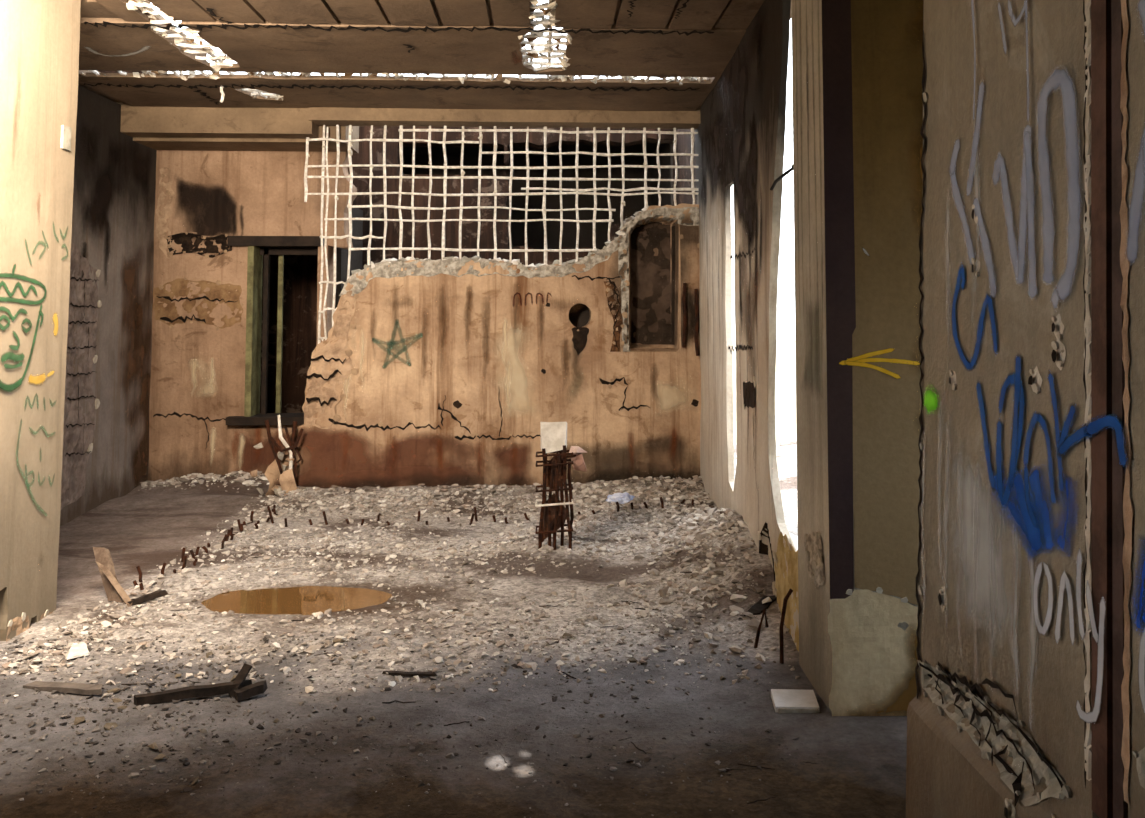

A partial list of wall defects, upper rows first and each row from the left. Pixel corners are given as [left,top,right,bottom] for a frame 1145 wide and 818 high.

damp [84,133,150,231]
damp [122,255,152,487]
damp [177,181,236,240]
spalling [304,125,700,429]
crack [915,0,1092,806]
crack [1120,0,1133,803]